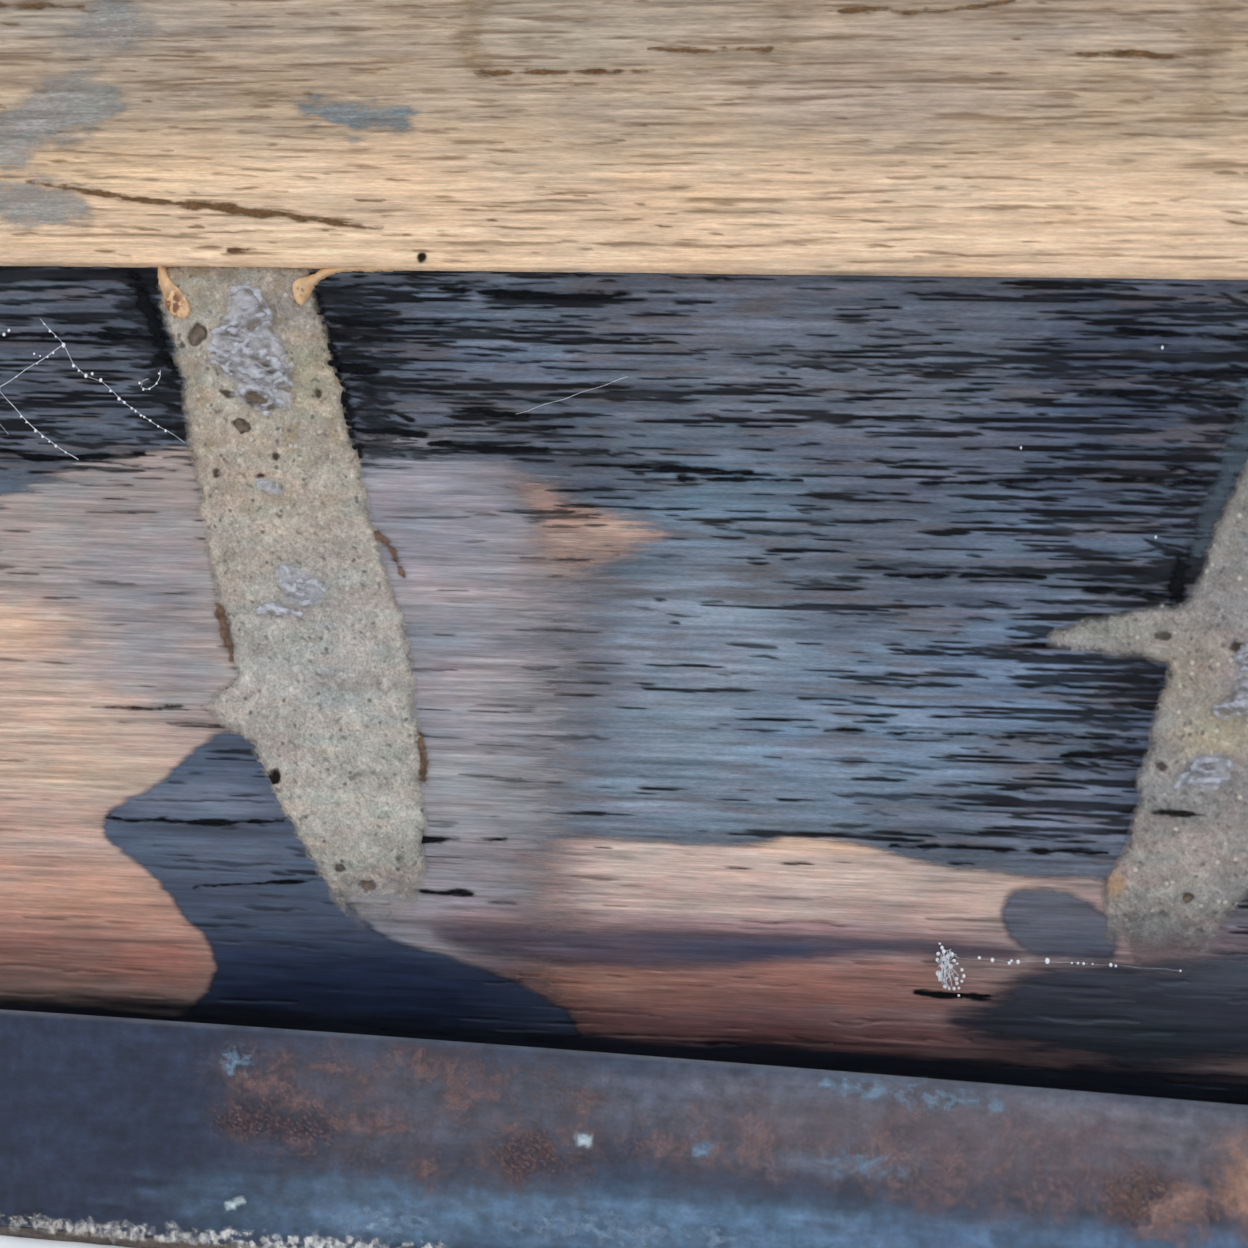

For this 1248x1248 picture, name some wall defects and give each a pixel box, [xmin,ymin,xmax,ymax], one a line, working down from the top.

leakage [0,70,126,226]
leakage [296,95,415,139]
rust [233,1051,406,1135]
rust [1106,1144,1248,1237]